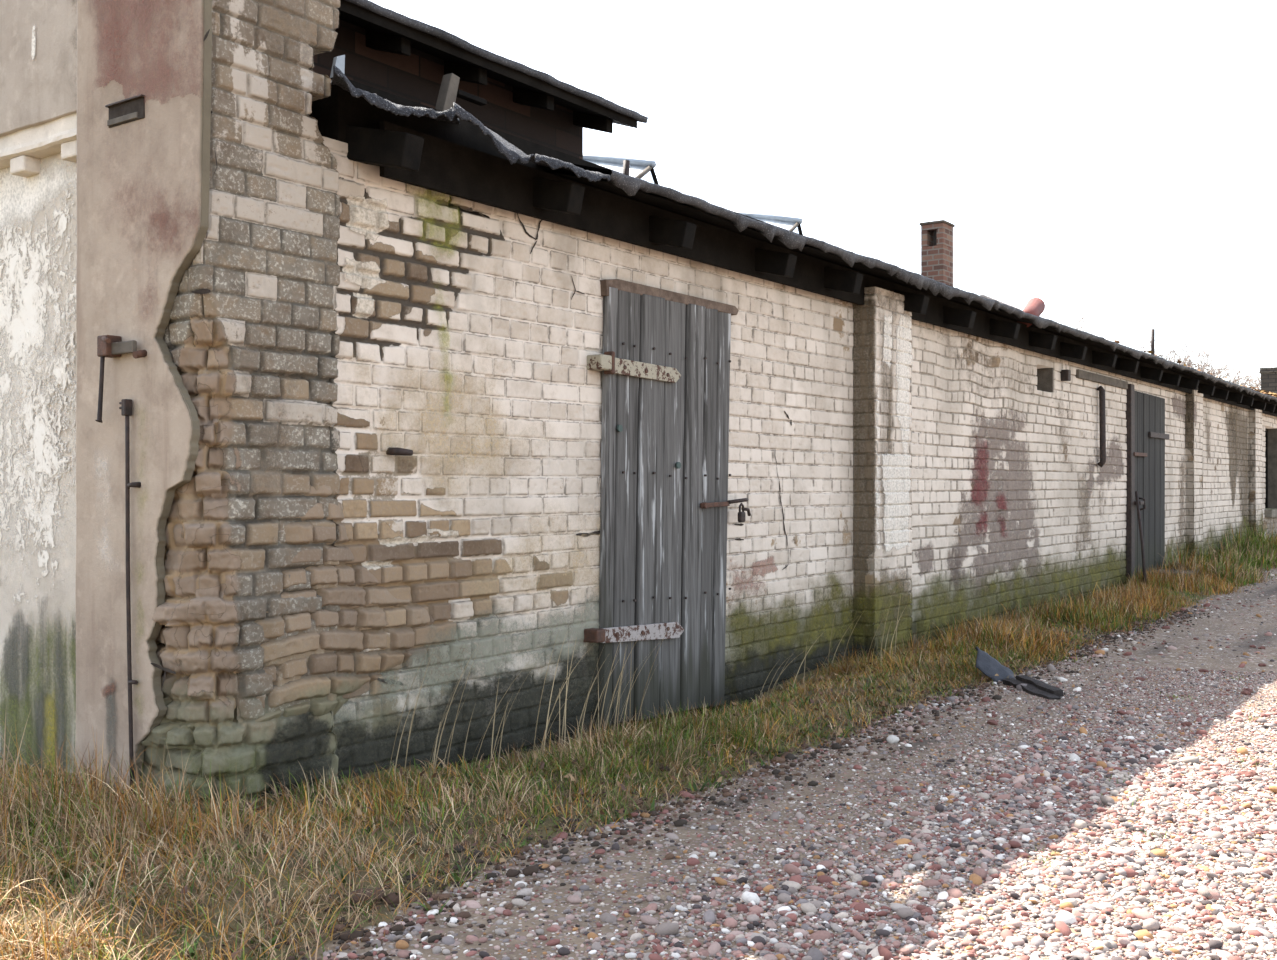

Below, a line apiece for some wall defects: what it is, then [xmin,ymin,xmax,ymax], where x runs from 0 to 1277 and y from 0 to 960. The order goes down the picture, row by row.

water stain [96,0,177,99]
peeling [336,192,505,361]
peeling [0,173,77,606]
spalling [167,315,242,706]
water stain [971,436,1007,537]
water stain [0,615,76,775]
water stain [184,649,607,799]